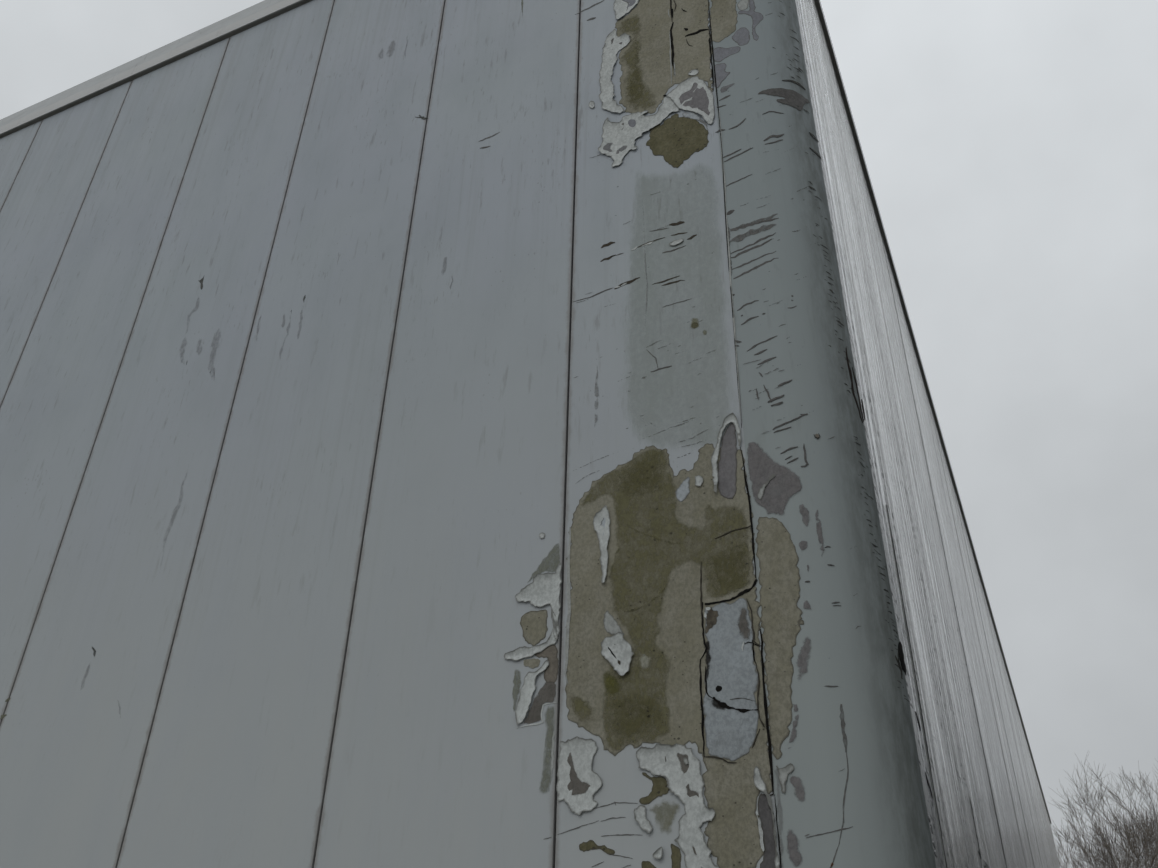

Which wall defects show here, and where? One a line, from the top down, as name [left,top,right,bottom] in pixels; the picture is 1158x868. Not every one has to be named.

peeling [589,0,764,168]
crack [663,0,714,97]
peeling [504,412,824,868]
crack [699,448,774,796]